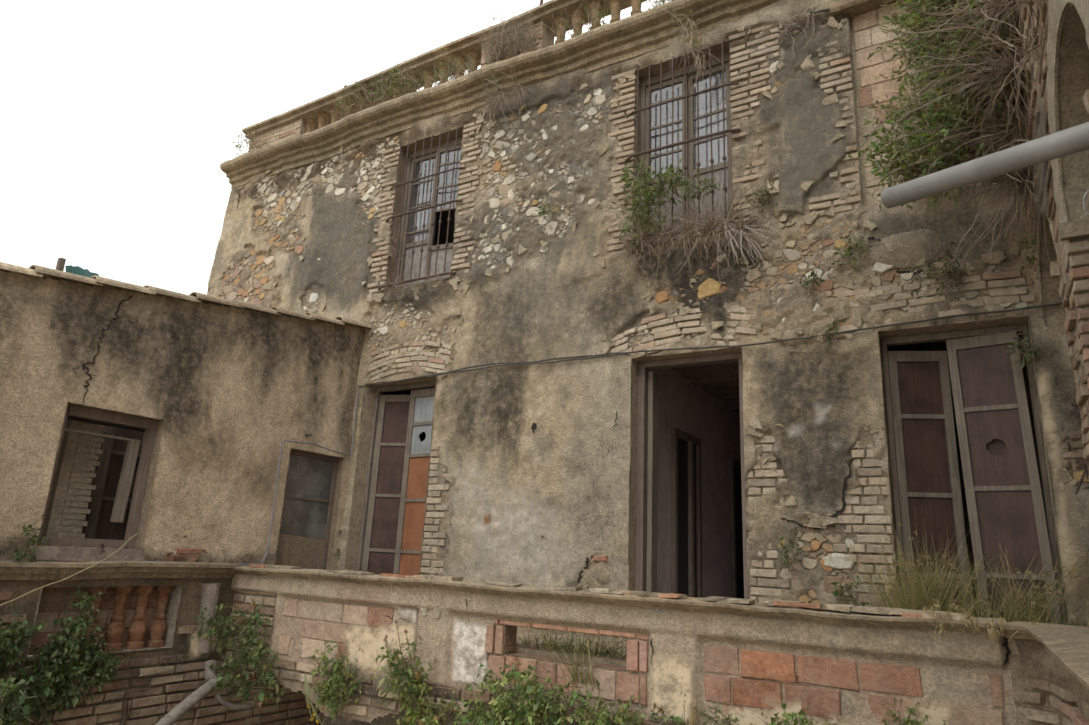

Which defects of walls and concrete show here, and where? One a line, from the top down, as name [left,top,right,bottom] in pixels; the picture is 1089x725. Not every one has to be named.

crack [72,295,134,403]
water stain [59,293,148,369]
water stain [150,314,362,413]
spalling [215,136,463,382]
spalling [420,445,455,576]
spalling [433,60,641,294]
water stain [761,348,852,517]
spalling [599,16,1035,361]
spalling [744,414,896,607]